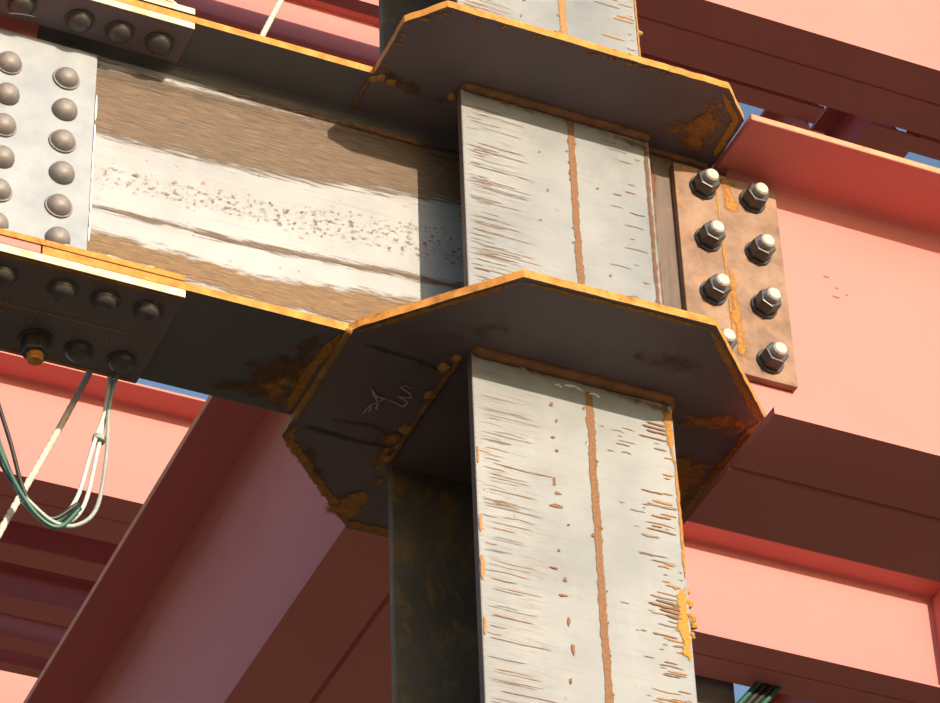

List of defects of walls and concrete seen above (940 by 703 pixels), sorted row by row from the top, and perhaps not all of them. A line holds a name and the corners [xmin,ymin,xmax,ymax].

corrosion [376,0,523,95]
corrosion [87,60,761,703]